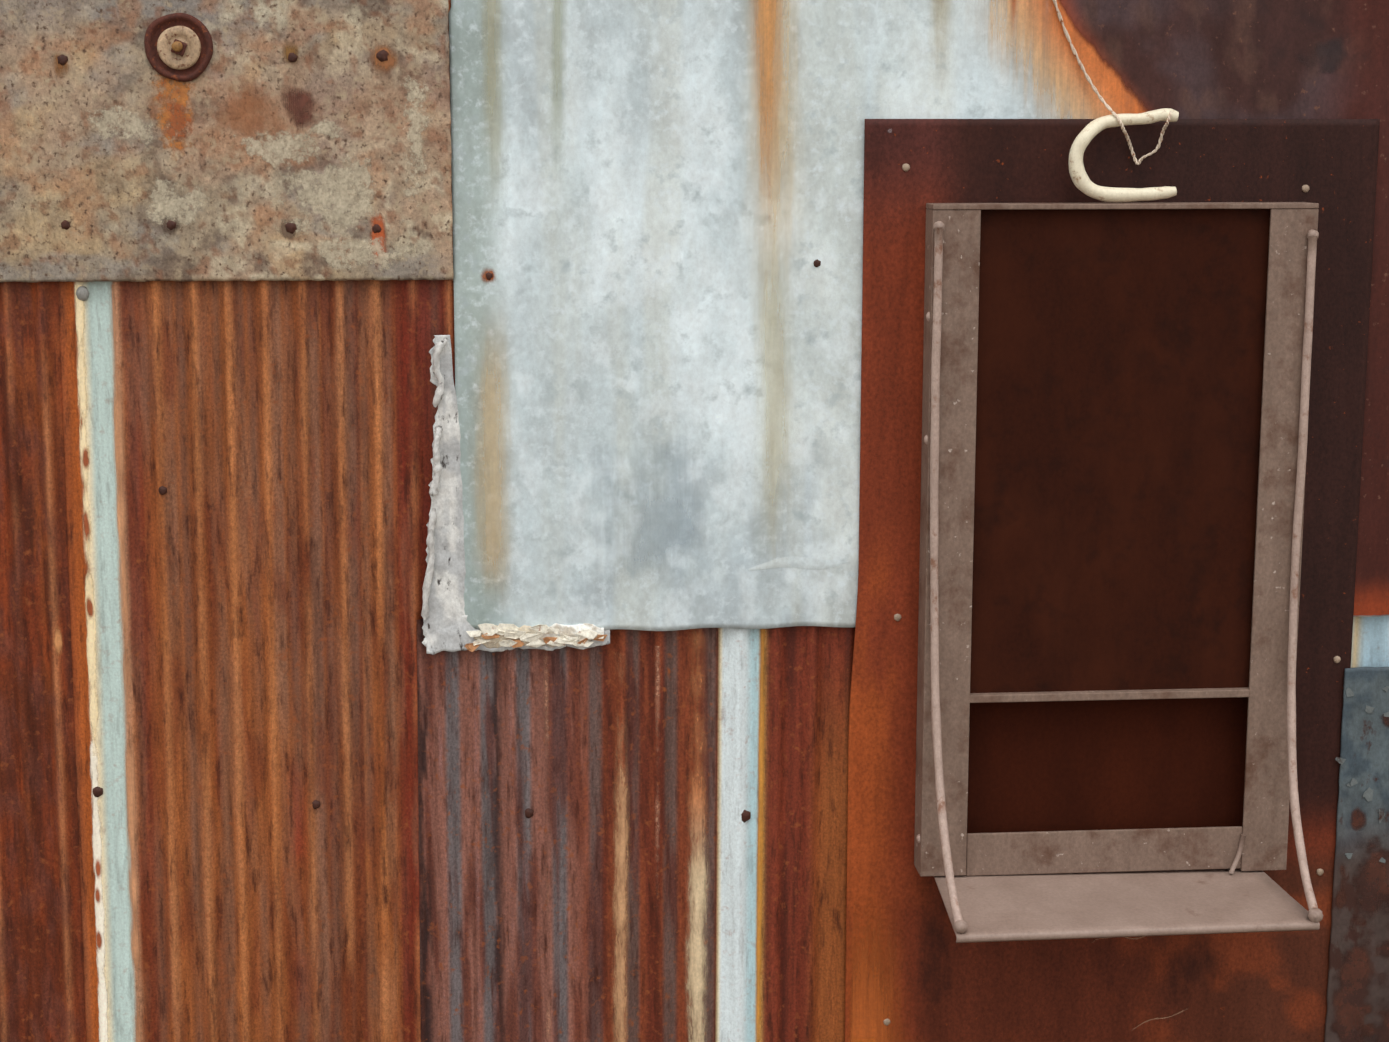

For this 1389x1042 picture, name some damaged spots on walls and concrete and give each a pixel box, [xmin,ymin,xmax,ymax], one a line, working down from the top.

corrosion [156,75,192,150]
corrosion [284,89,311,127]
corrosion [757,0,778,149]
corrosion [991,0,1389,616]
corrosion [114,367,128,635]
corrosion [54,629,62,653]
peeling [464,623,607,652]
peeling [1346,687,1389,726]
corrosion [125,744,139,968]
corrosion [756,629,765,1041]
peeling [1335,757,1389,925]
peeling [1332,941,1389,1042]